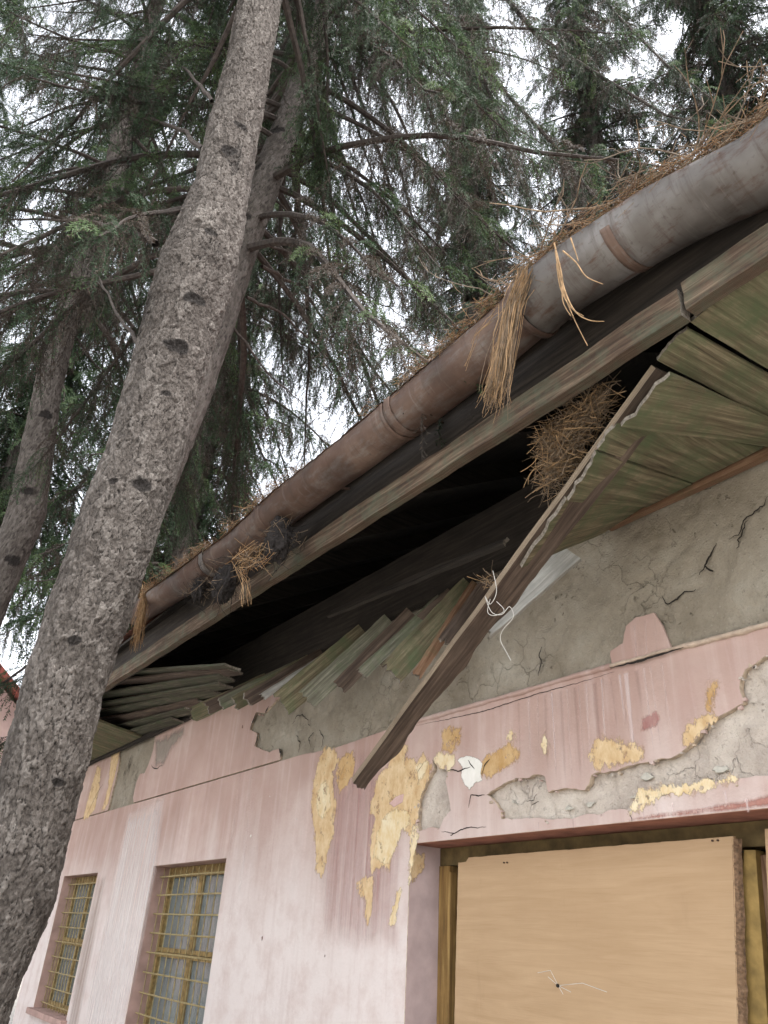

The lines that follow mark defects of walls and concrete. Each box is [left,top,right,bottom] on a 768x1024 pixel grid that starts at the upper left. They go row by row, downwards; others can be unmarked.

spalling [423,460,768,717]
crack [662,496,768,605]
spalling [83,737,155,820]
spalling [242,644,448,878]
peeling [356,726,461,926]
crack [444,759,490,836]
peeling [480,730,520,778]
spalling [489,655,768,824]